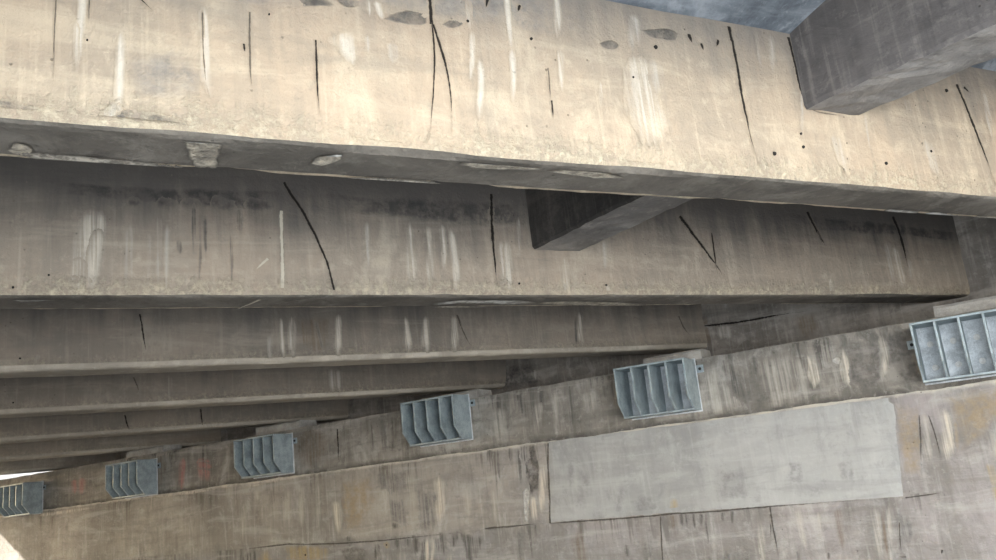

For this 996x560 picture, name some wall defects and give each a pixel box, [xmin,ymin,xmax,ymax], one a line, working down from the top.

crack [51,0,59,79]
crack [241,12,253,90]
crack [313,40,321,116]
peeling [300,0,359,8]
peeling [384,10,427,26]
crack [426,0,453,143]
peeling [442,20,469,29]
crack [725,26,760,166]
crack [954,84,996,183]
crack [237,181,337,309]
crack [487,193,498,284]
crack [677,215,728,283]